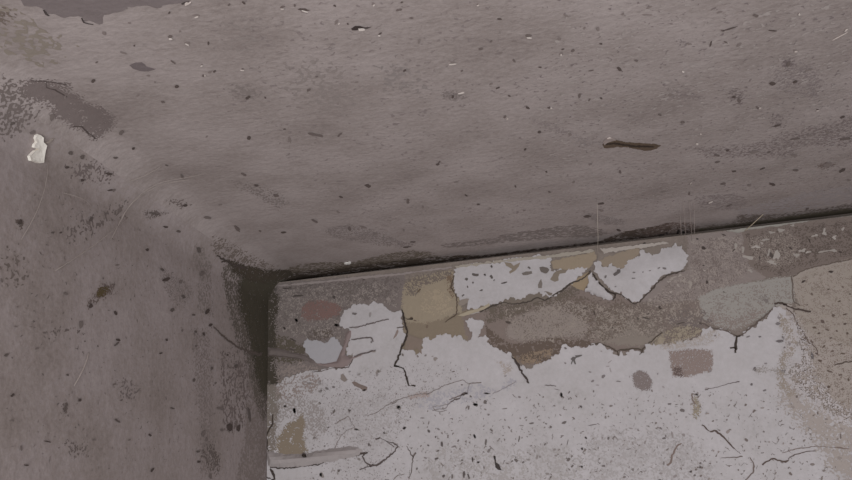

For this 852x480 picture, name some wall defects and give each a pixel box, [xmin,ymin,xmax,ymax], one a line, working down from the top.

peeling [27,134,47,163]
crack [445,272,458,322]
crack [480,270,685,312]
peeling [267,209,852,480]
crack [267,310,556,480]
crack [702,425,849,480]